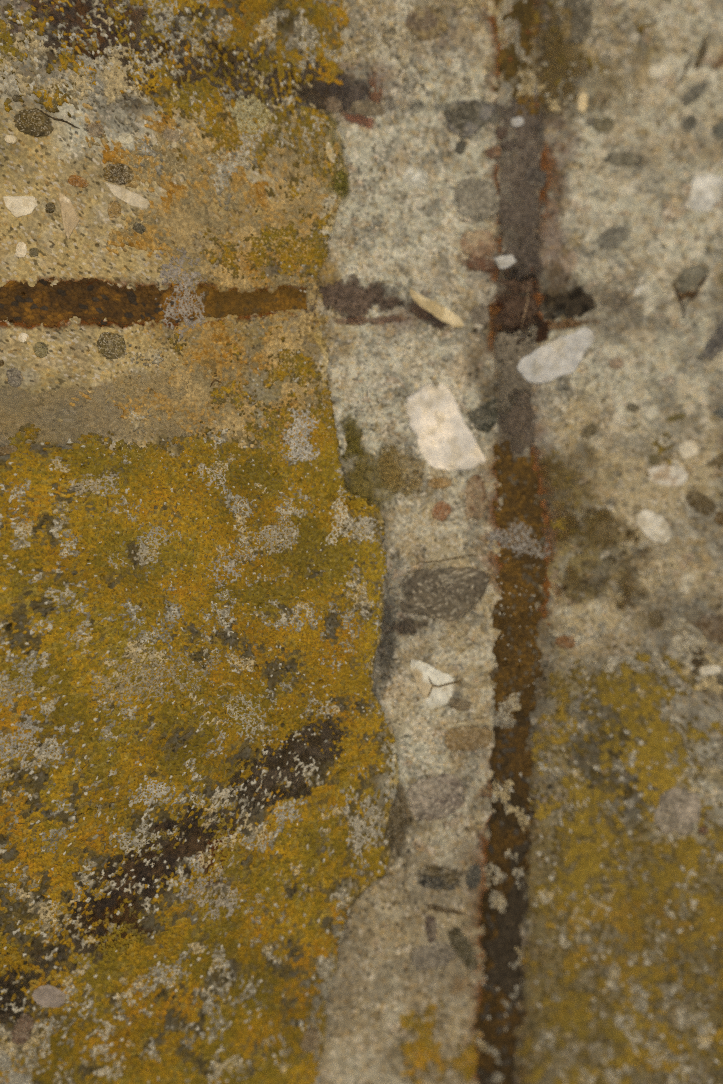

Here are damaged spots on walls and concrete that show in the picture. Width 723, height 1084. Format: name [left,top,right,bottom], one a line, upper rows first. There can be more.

corrosion [0,275,449,329]
corrosion [473,0,596,1084]